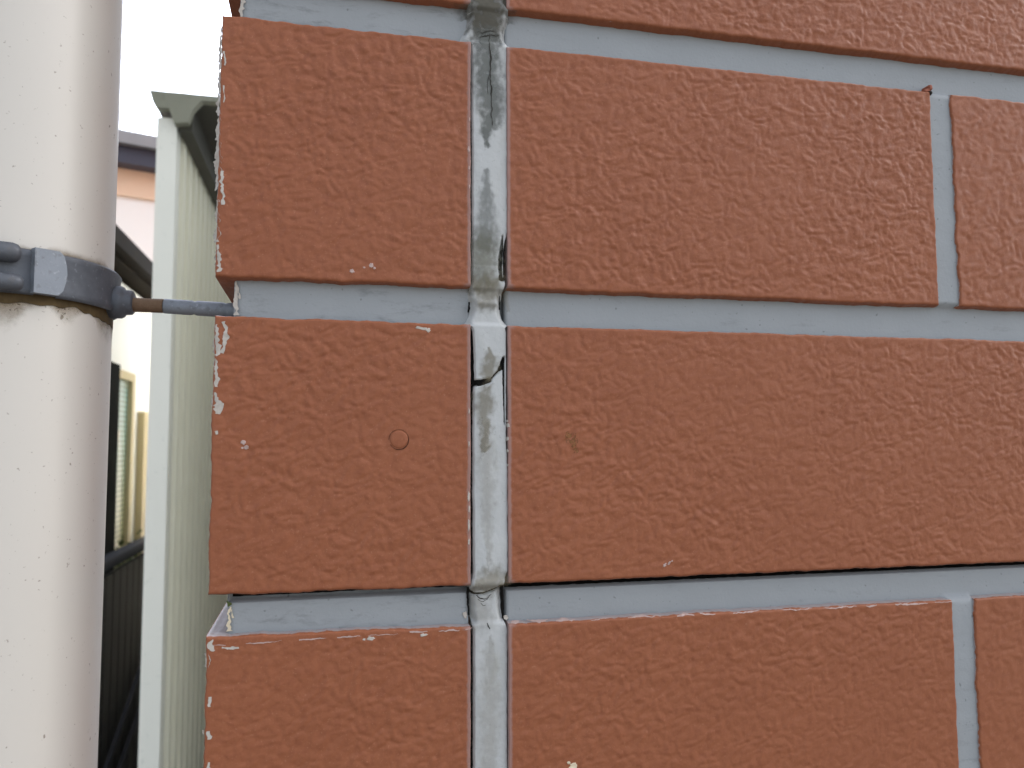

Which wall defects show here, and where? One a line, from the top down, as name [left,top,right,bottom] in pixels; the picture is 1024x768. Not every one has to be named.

peeling [213,27,226,272]
crack [470,30,499,148]
damp [464,0,508,147]
peeling [211,281,241,414]
crack [466,187,505,768]
peeling [204,640,277,667]